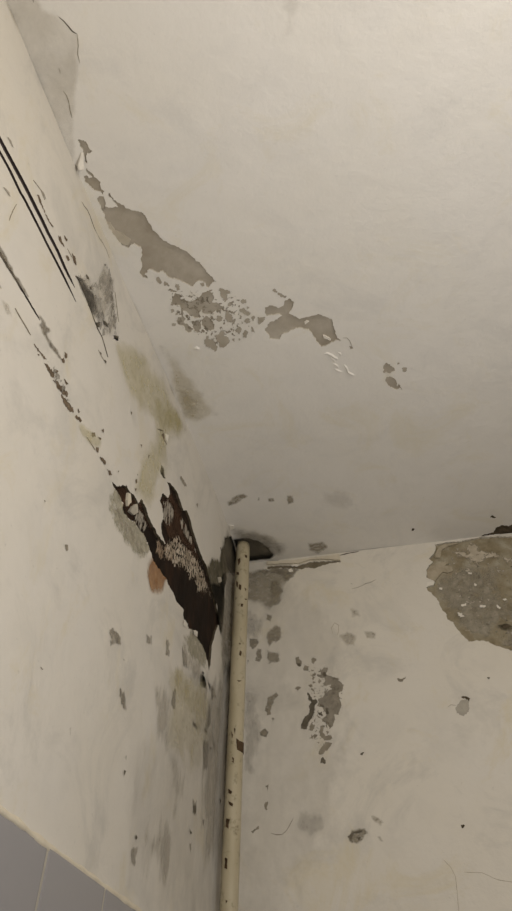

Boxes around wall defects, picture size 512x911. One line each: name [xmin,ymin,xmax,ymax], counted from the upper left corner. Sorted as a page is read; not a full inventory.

crack [0,142,68,276]
spalling [77,139,353,351]
peeling [15,308,82,422]
spalling [75,265,119,363]
leakage [110,490,149,553]
spalling [114,466,219,661]
spalling [427,515,512,651]
leakage [182,630,206,675]
leakage [193,525,285,847]
peeling [295,657,344,764]